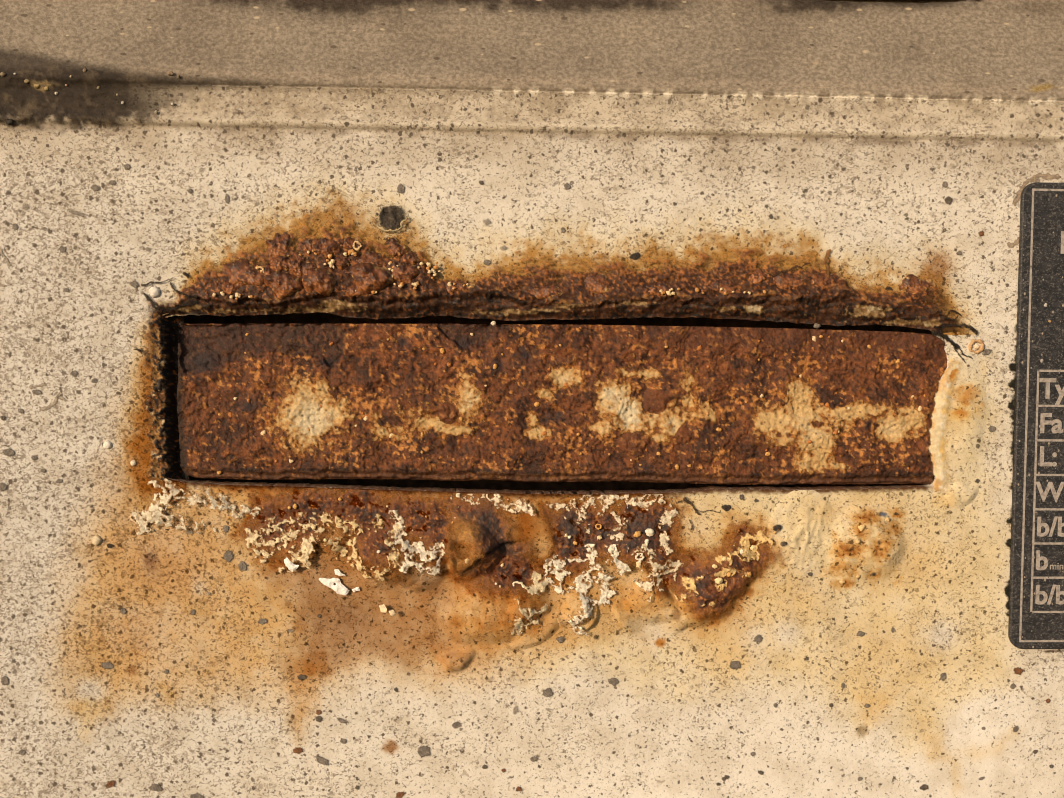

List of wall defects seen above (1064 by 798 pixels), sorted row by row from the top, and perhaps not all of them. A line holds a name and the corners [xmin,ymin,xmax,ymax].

water stain [0,50,236,129]
corrosion [145,212,958,619]